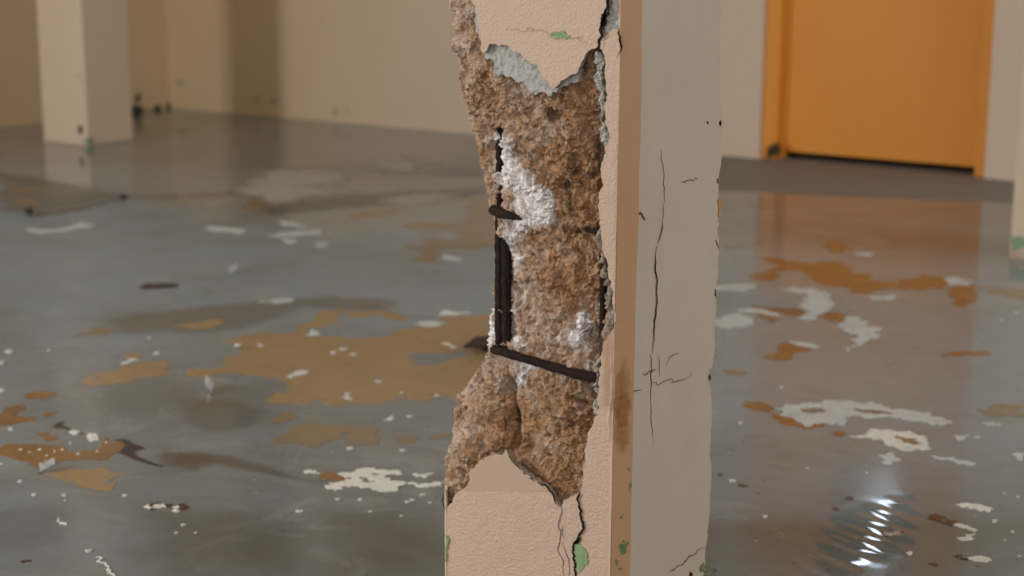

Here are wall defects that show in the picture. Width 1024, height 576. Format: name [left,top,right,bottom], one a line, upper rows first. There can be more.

crack [504,0,622,56]
spalling [185,0,620,506]
water stain [511,293,526,348]
water stain [493,131,557,279]
crack [634,151,698,444]
peeling [749,241,1024,308]
peeling [741,401,846,437]
crack [510,458,585,576]